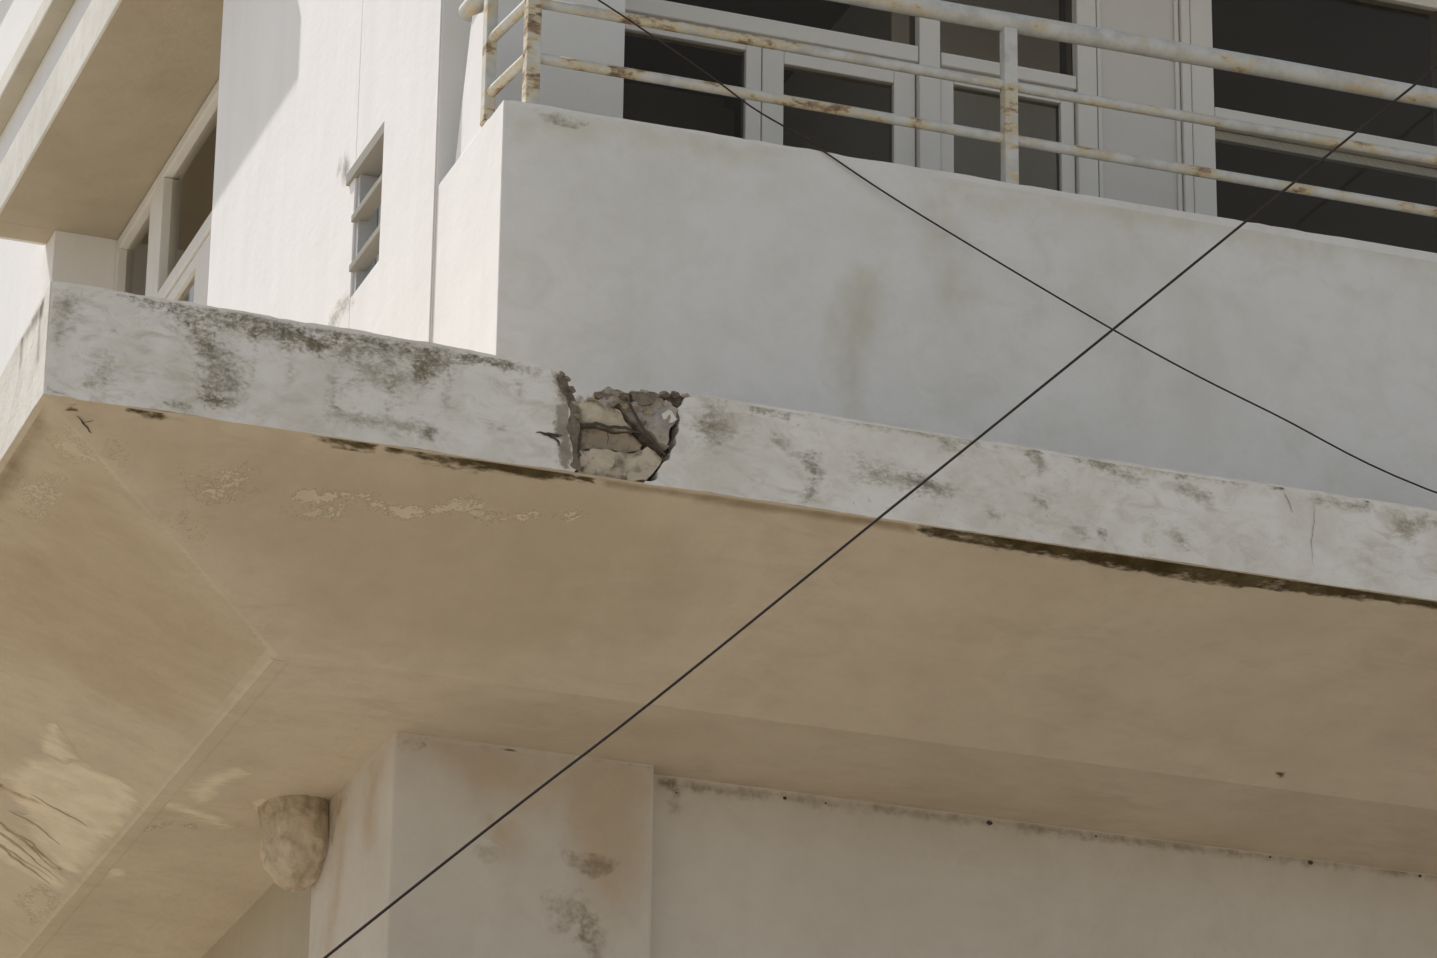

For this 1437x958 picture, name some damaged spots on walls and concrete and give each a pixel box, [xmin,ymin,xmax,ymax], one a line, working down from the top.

leakage [253,328,366,352]
spalling [554,371,690,483]
leakage [0,398,787,748]
peeling [0,722,147,891]
leakage [463,832,502,867]